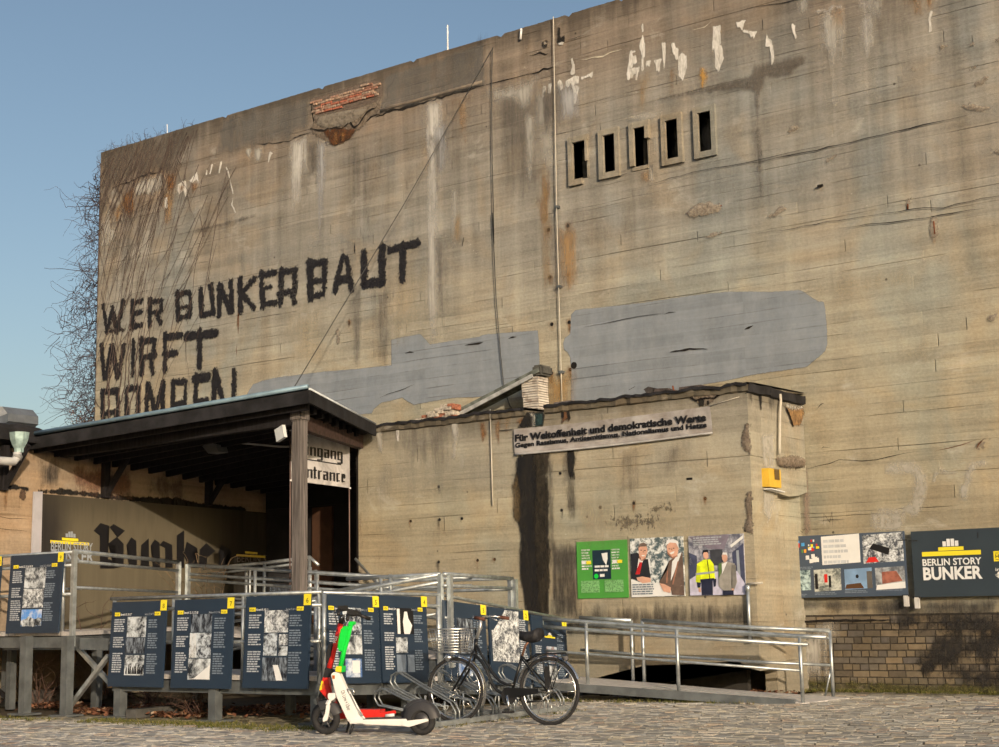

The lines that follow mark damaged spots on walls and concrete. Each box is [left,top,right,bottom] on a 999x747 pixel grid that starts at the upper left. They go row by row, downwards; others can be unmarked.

crack [568,35,621,60]
spalling [310,79,383,146]
crack [262,52,554,145]
leakage [427,103,445,317]
leakage [512,450,579,626]
leakage [618,608,745,625]